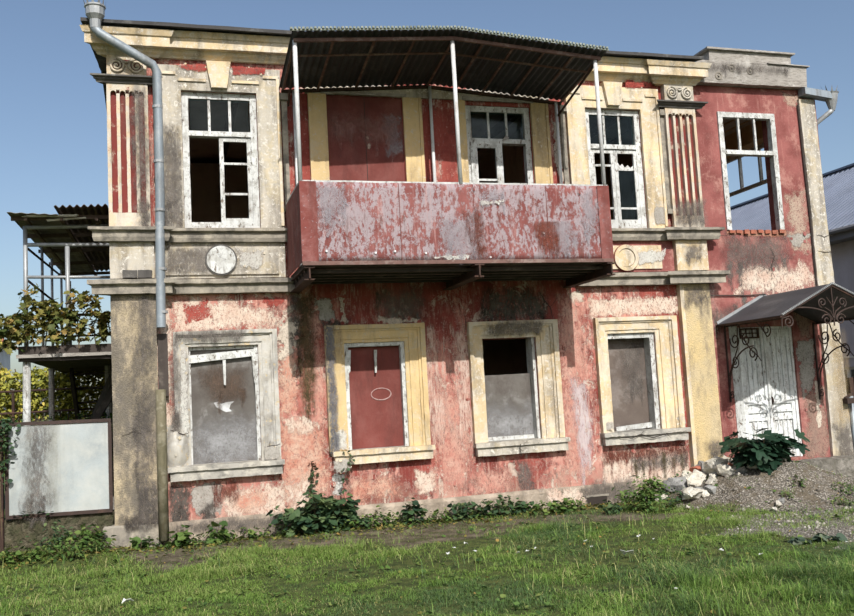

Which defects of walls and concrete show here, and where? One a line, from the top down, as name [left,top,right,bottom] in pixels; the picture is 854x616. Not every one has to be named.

leakage [163,127,183,226]
peeling [434,187,505,260]
peeling [549,192,599,257]
leakage [677,201,705,227]
peeling [727,189,816,297]
leakage [480,286,548,336]
peeling [569,289,679,326]
leakage [124,386,158,531]
peeling [157,296,299,458]
leakage [291,294,345,453]
leakage [566,332,687,504]